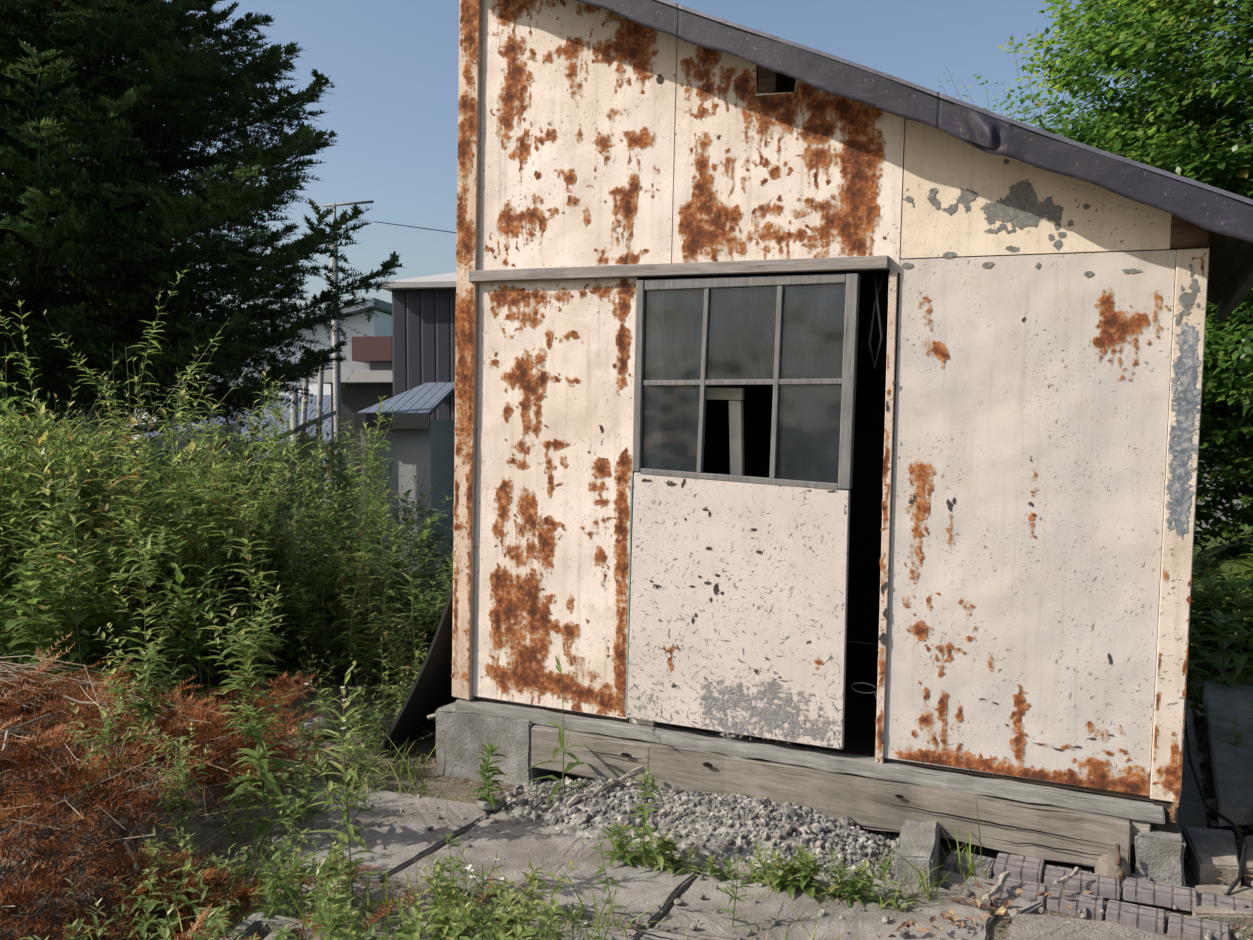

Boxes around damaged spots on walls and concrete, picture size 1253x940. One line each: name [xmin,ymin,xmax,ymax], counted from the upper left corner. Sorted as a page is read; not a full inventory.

corrosion [456,0,659,270]
corrosion [674,41,886,262]
peeling [903,179,1074,252]
corrosion [451,279,636,717]
corrosion [881,428,890,531]
corrosion [901,462,977,676]
corrosion [1093,290,1170,380]
peeling [1165,264,1203,539]
peeling [695,675,841,746]
corrosion [875,639,1189,822]